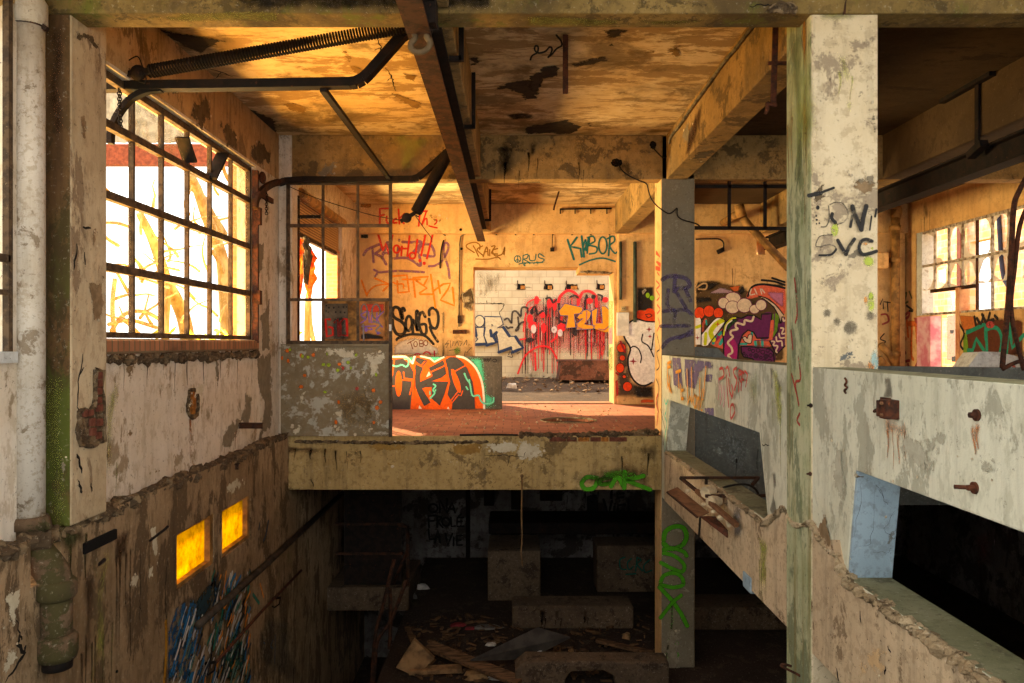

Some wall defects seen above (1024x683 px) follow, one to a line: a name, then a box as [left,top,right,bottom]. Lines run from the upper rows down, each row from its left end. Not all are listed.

water stain [497,66,560,100]
water stain [494,114,592,185]
water stain [288,447,361,470]
spalling [0,299,660,562]
peeling [130,526,160,587]
spalling [664,451,1007,683]
water stain [81,533,131,683]